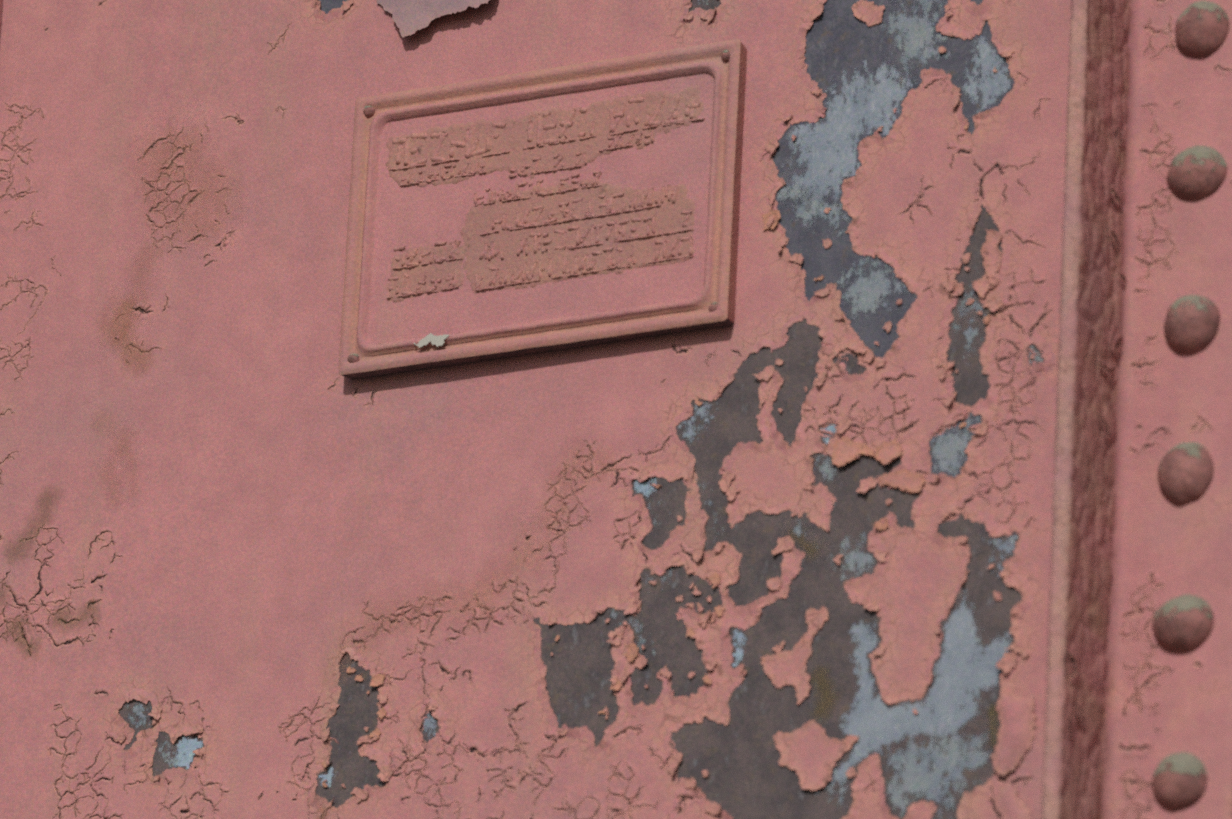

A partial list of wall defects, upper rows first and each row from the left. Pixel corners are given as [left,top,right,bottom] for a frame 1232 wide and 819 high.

peeling [310,0,355,23]
peeling [376,0,490,37]
crack [0,102,47,232]
crack [137,112,247,269]
crack [0,255,62,418]
peeling [414,333,449,348]
peeling [526,0,1034,819]
crack [0,522,123,657]
crack [340,434,706,819]
peeling [109,688,215,786]
crack [47,686,343,819]
peeling [307,645,396,817]